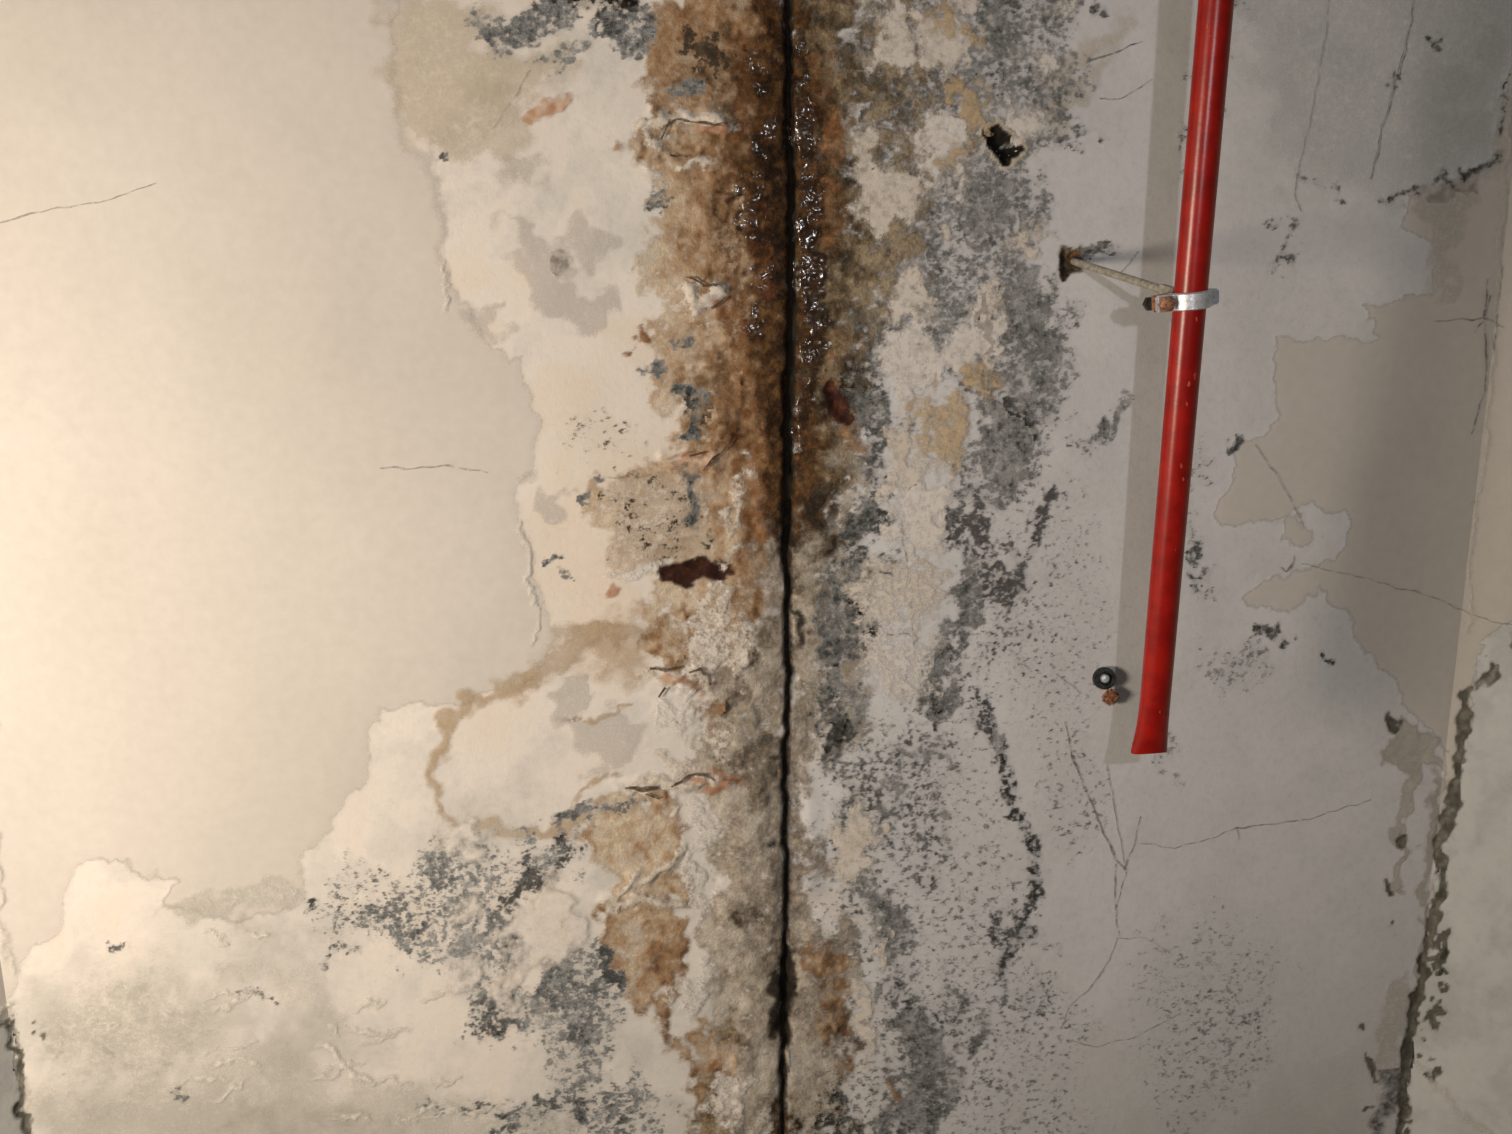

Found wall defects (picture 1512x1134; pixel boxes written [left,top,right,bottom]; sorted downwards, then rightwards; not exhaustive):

peeling [0,0,786,1134]
damp [426,41,882,1134]
corrosion [582,0,963,706]
crack [767,0,805,1134]
peeling [732,0,1512,1134]
crack [1062,738,1356,1046]